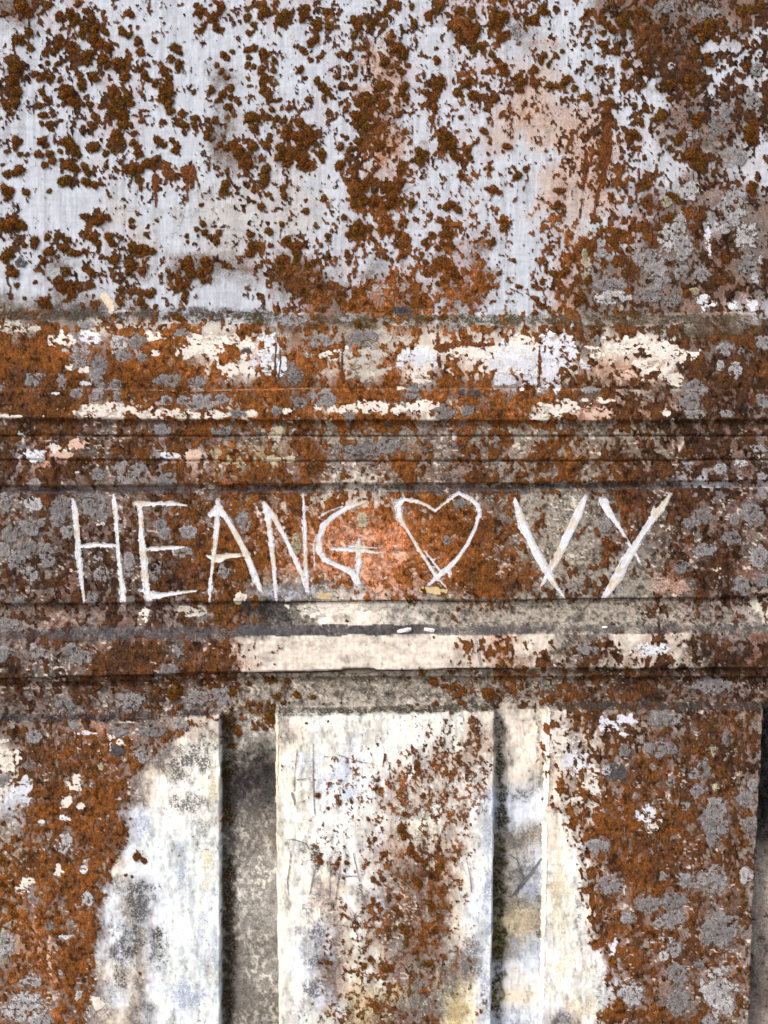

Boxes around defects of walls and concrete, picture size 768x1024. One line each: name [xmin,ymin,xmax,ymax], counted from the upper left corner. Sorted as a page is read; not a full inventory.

rust [27,0,63,27]
rust [0,134,37,222]
rust [50,150,93,190]
rust [755,492,768,532]